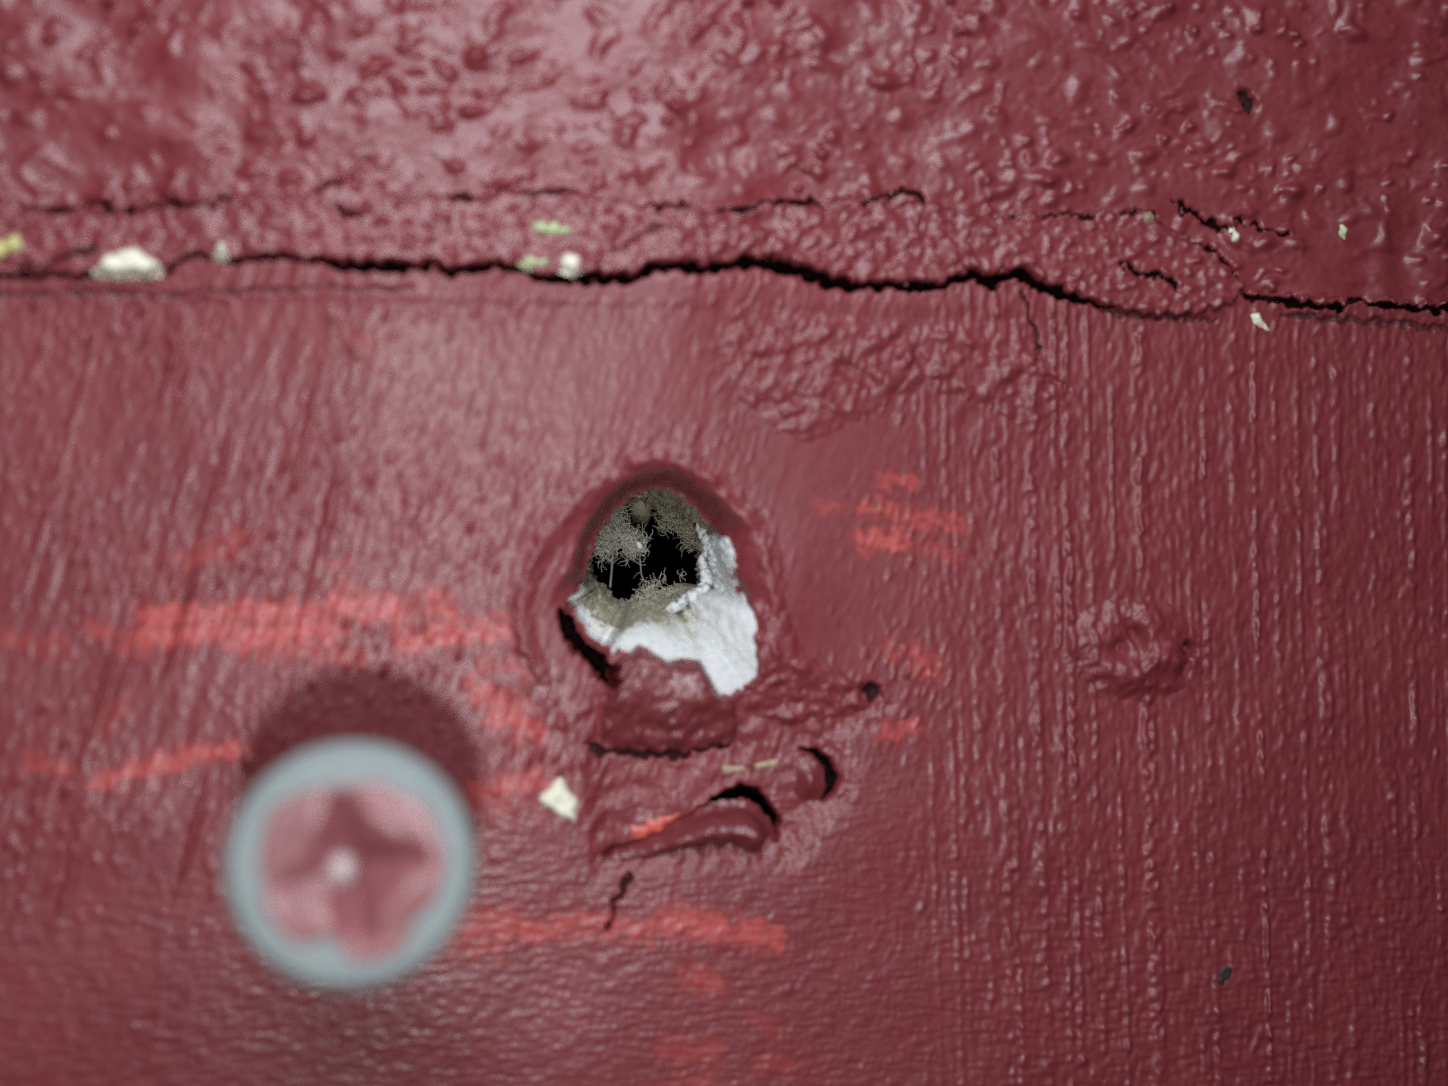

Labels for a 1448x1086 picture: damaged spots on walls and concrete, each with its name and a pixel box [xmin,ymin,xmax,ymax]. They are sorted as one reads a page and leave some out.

crack [313,157,370,218]
crack [447,186,579,203]
crack [860,187,926,207]
crack [0,195,1115,353]
crack [1007,199,1448,333]
hole [592,504,698,601]
spalling [861,683,879,703]
peeling [539,777,578,822]
spalling [604,759,778,862]